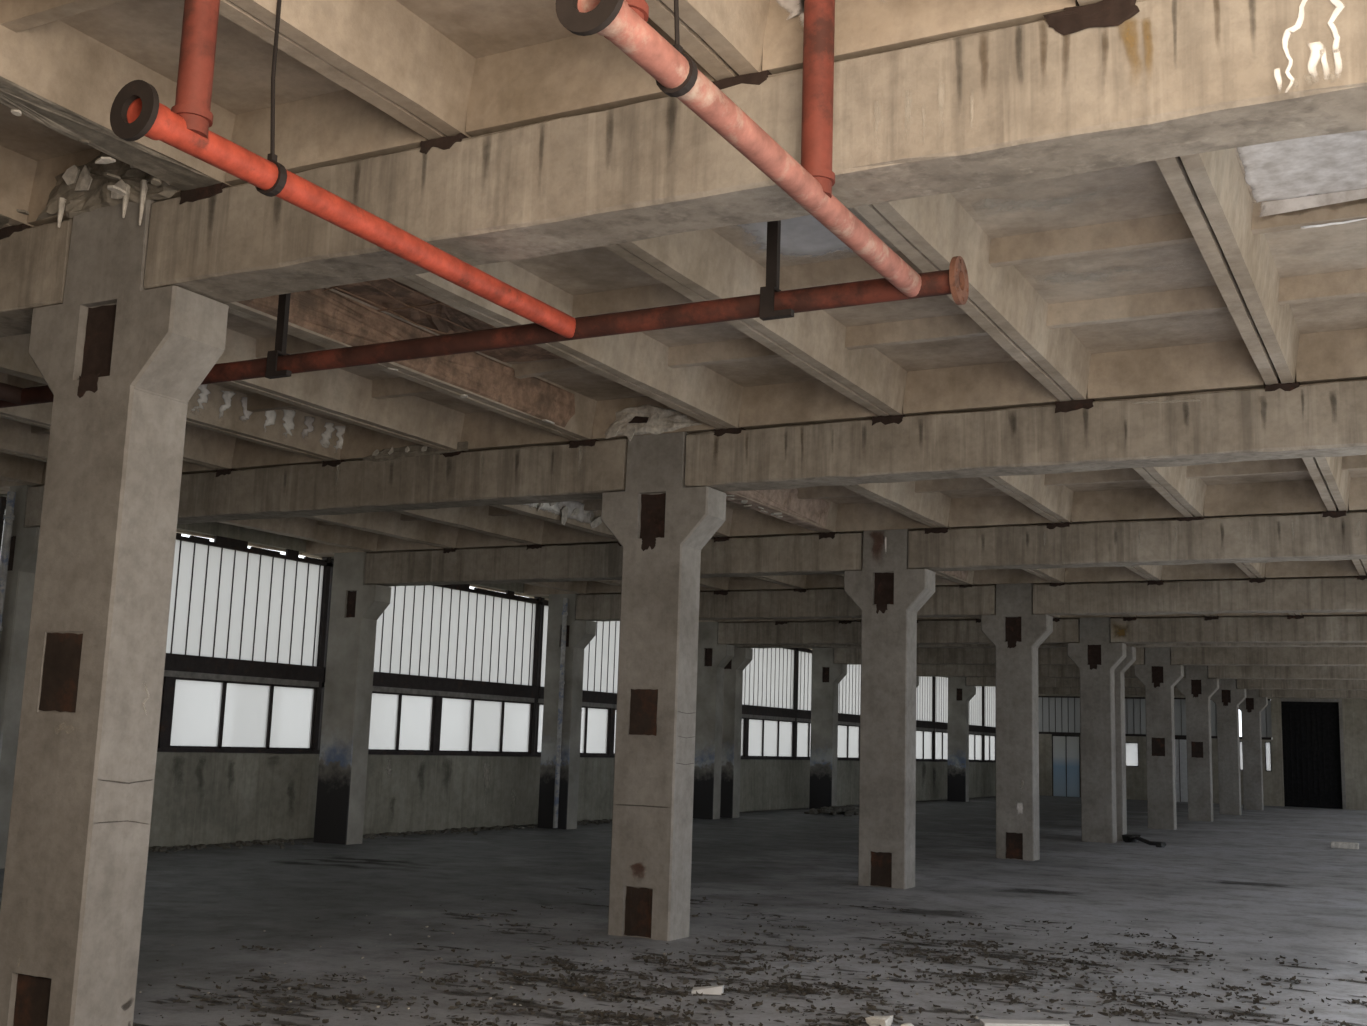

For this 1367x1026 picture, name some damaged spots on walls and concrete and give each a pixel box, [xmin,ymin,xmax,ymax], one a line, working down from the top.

peeling [778,0,804,22]
efflorescence [1274,0,1344,92]
efflorescence [194,384,346,449]